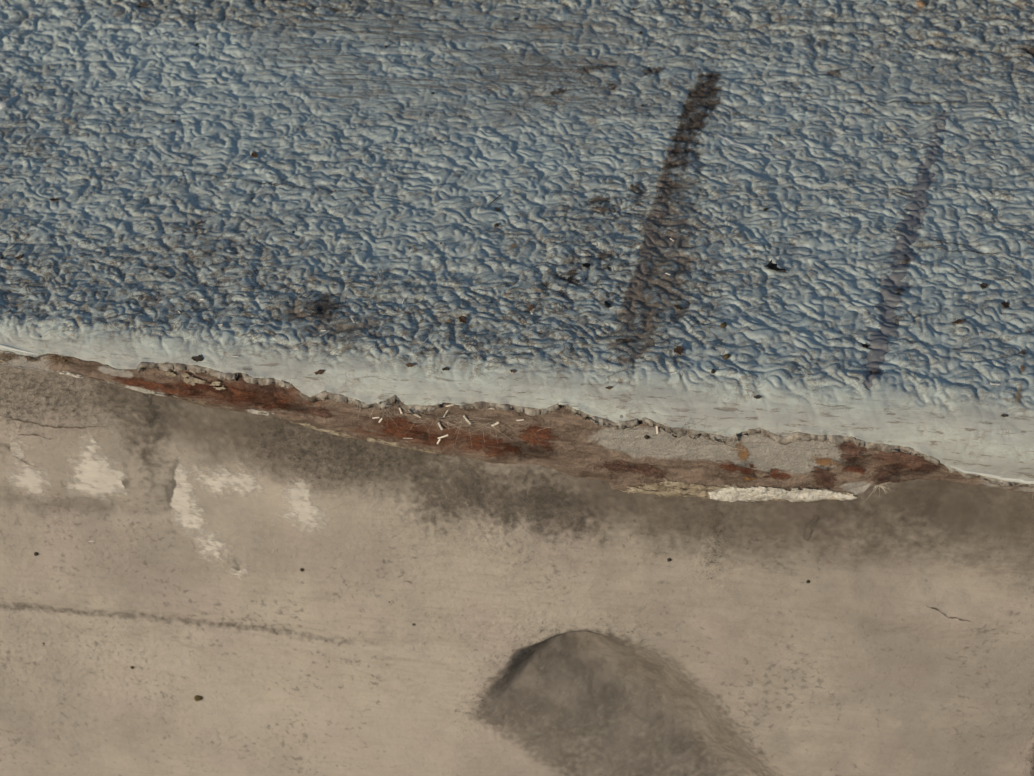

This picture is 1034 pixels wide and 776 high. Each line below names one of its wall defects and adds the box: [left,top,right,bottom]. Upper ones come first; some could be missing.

damp [607,71,722,365]
damp [0,368,859,571]
spalling [0,342,1034,502]